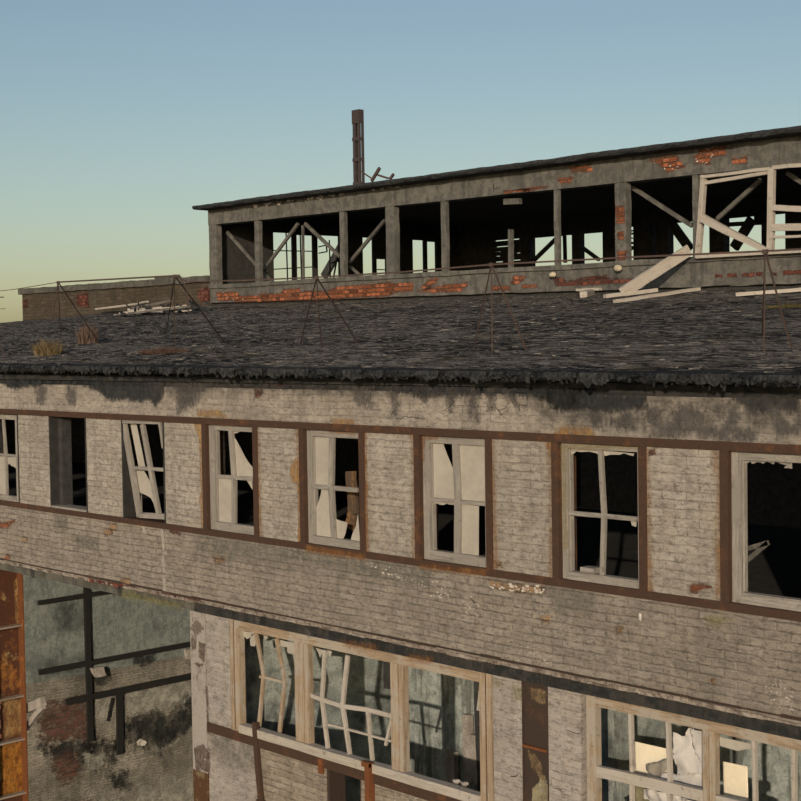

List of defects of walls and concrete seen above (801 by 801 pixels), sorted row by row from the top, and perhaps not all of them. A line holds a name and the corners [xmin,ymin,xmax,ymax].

spalling [647,155,685,172]
spalling [694,146,748,165]
water stain [468,393,497,422]
peeling [190,638,205,667]
corrosion [0,699,23,797]
flaking render [532,776,548,801]